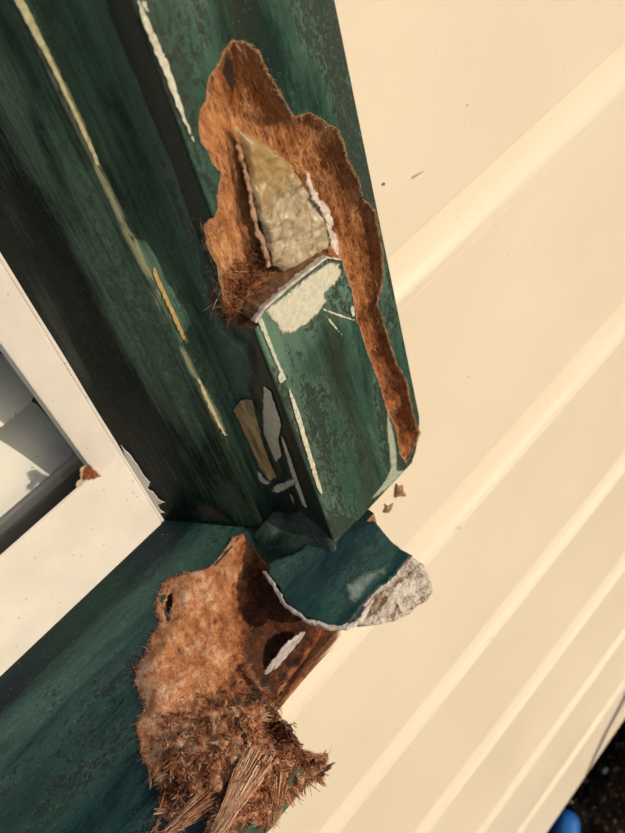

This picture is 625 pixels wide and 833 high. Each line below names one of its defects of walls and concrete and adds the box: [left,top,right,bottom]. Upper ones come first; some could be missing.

peeling [234,128,271,267]
peeling [251,166,341,494]
peeling [198,378,228,436]
peeling [234,387,307,508]
peeling [373,415,406,513]